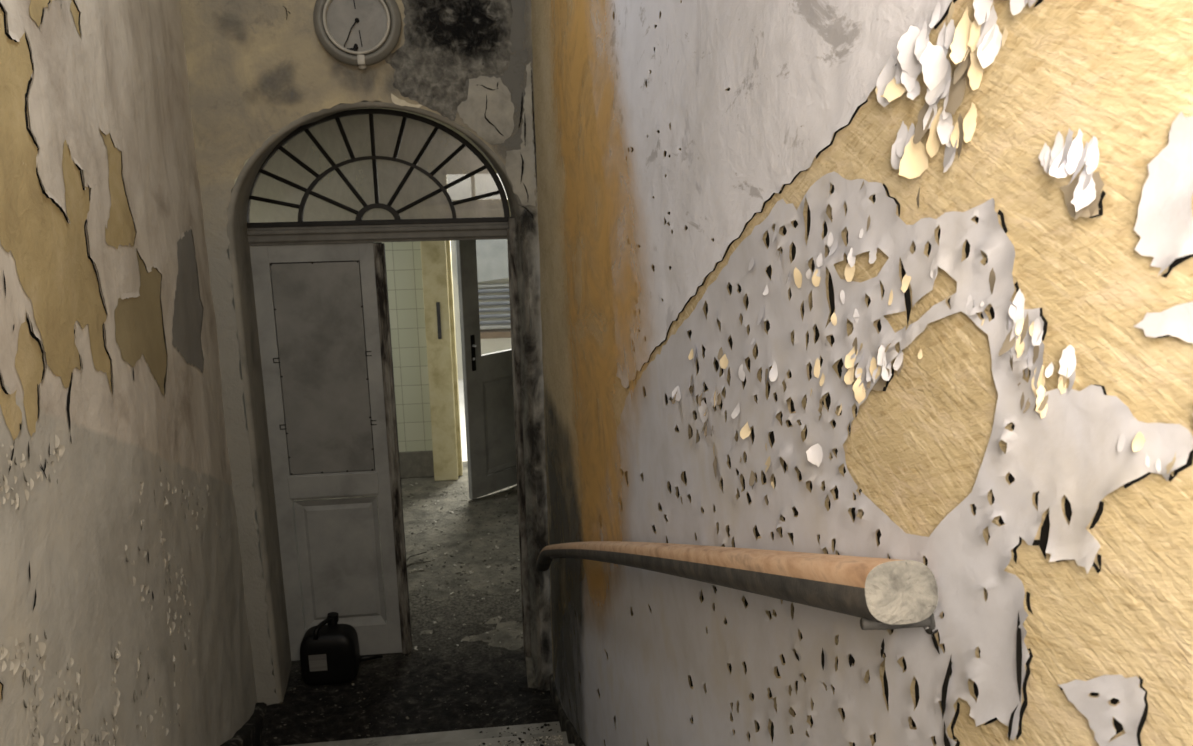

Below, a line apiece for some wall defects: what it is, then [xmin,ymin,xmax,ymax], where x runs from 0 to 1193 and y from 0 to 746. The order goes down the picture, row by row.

flaking render [385,0,537,206]
water stain [414,0,531,156]
peeling [0,0,204,510]
peeling [554,0,1193,746]
peeling [0,630,181,746]